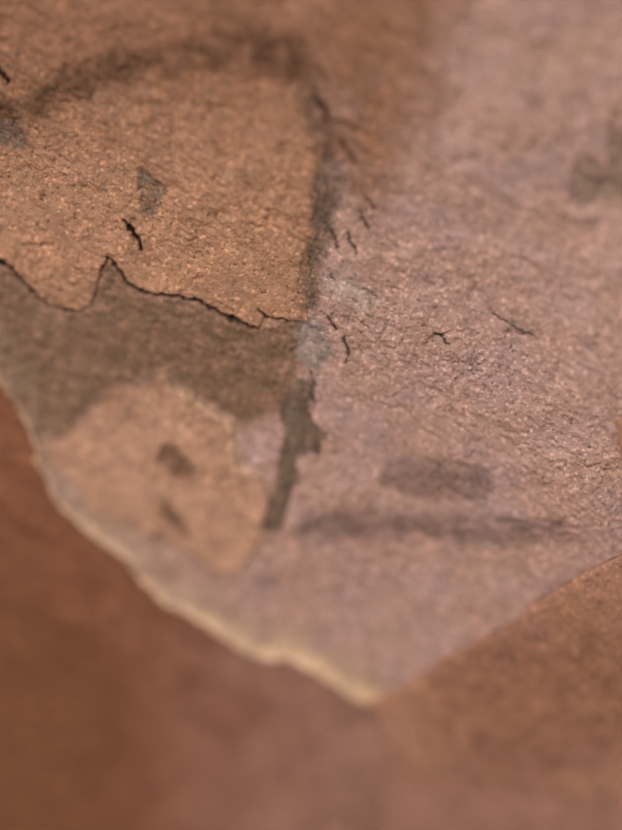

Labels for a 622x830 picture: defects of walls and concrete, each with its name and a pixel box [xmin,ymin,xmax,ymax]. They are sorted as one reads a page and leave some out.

crack [0,67,10,84]
crack [313,66,360,163]
spalling [138,169,166,213]
crack [123,220,143,250]
crack [329,196,375,248]
crack [0,259,79,312]
crack [106,256,298,329]
crack [329,317,350,363]
crack [307,371,315,407]
spalling [159,448,193,477]